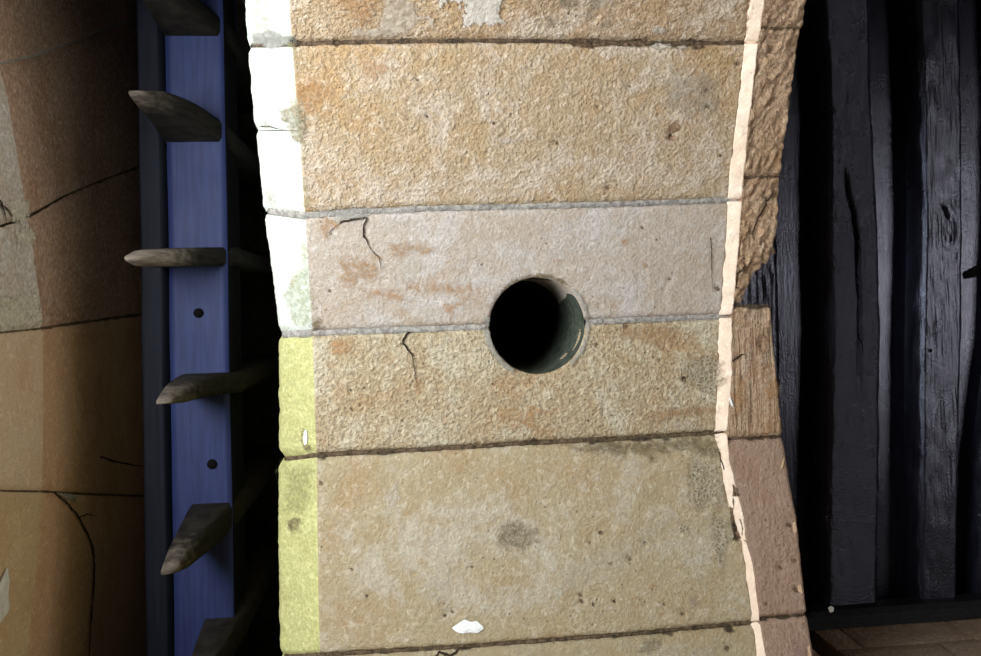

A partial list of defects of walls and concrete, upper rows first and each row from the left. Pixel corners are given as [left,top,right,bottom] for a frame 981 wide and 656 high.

peeling [352,0,434,39]
peeling [437,0,504,28]
crack [0,194,69,227]
crack [329,217,381,266]
crack [402,332,417,382]
peeling [0,568,10,623]
crack [55,492,95,656]